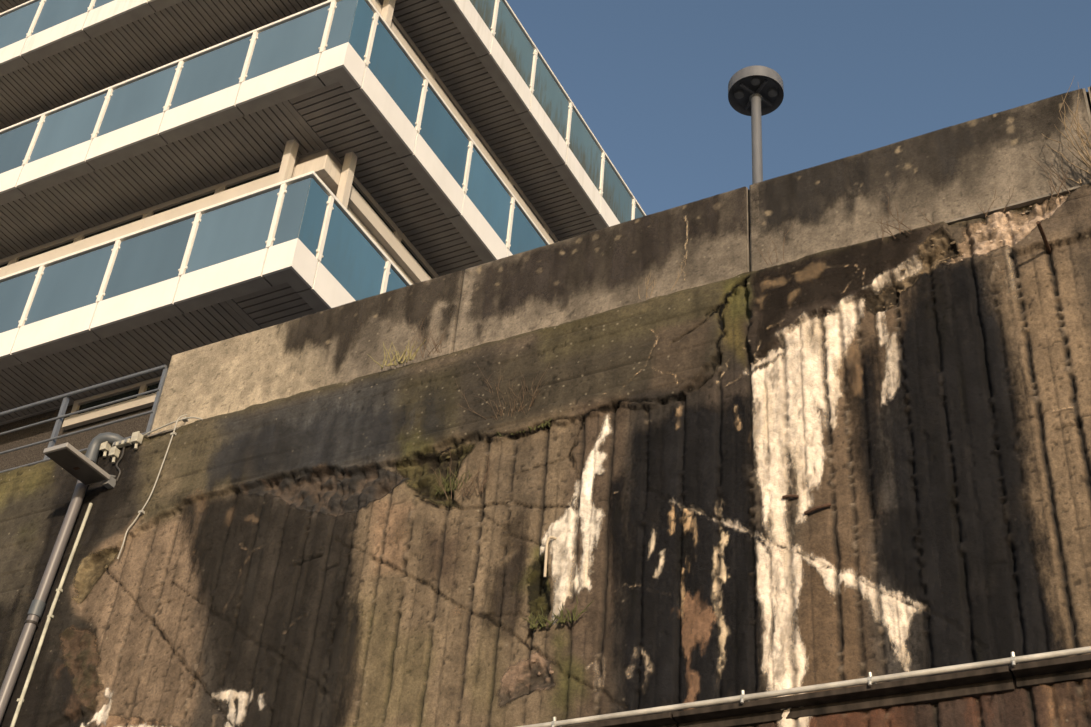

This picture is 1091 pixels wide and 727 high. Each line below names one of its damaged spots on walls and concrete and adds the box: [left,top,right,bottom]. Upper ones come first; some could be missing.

leakage [913,122,986,183]
leakage [278,270,463,370]
leakage [475,230,598,329]
crack [437,276,750,472]
leakage [606,146,900,288]
spalling [864,195,1070,315]
leakage [540,230,1066,727]
crack [106,568,272,726]
leakage [174,495,359,727]
crack [294,538,447,599]
leakage [488,547,526,624]
crack [474,613,587,686]